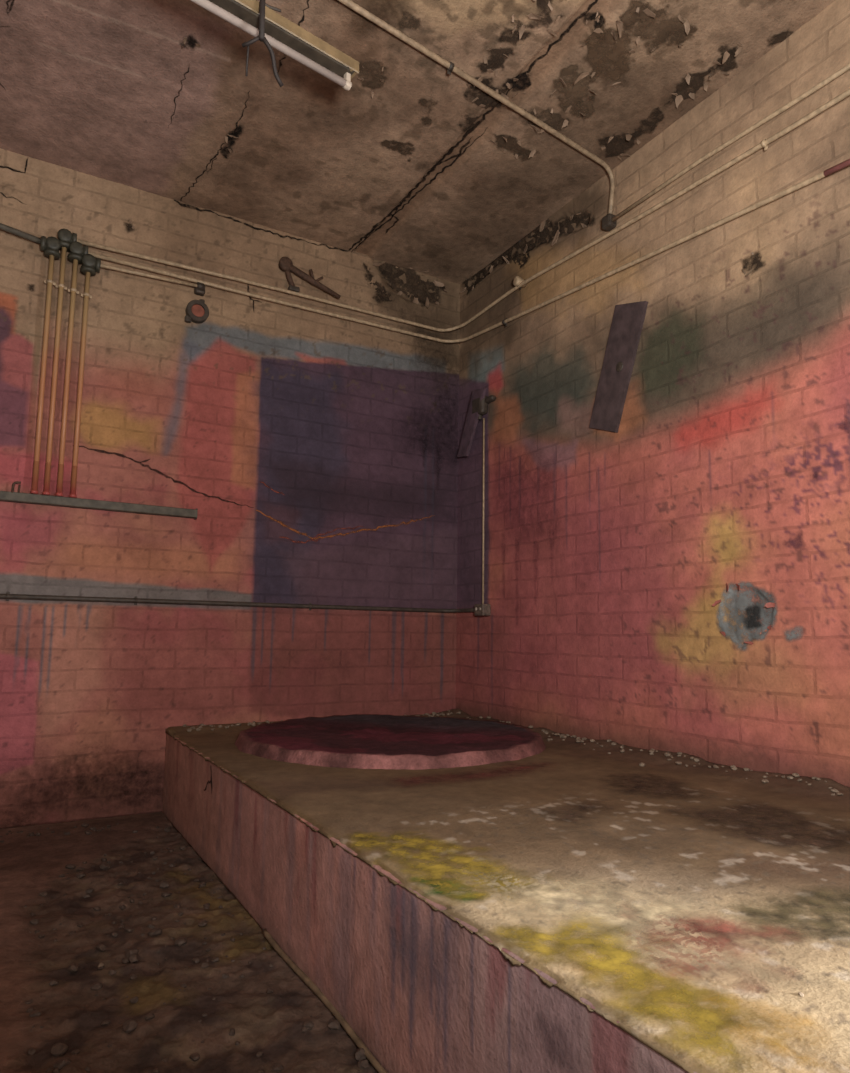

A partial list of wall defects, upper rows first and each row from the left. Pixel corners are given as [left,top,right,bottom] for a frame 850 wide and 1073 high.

crack [168,68,189,126]
crack [174,0,598,251]
spalling [712,582,777,650]